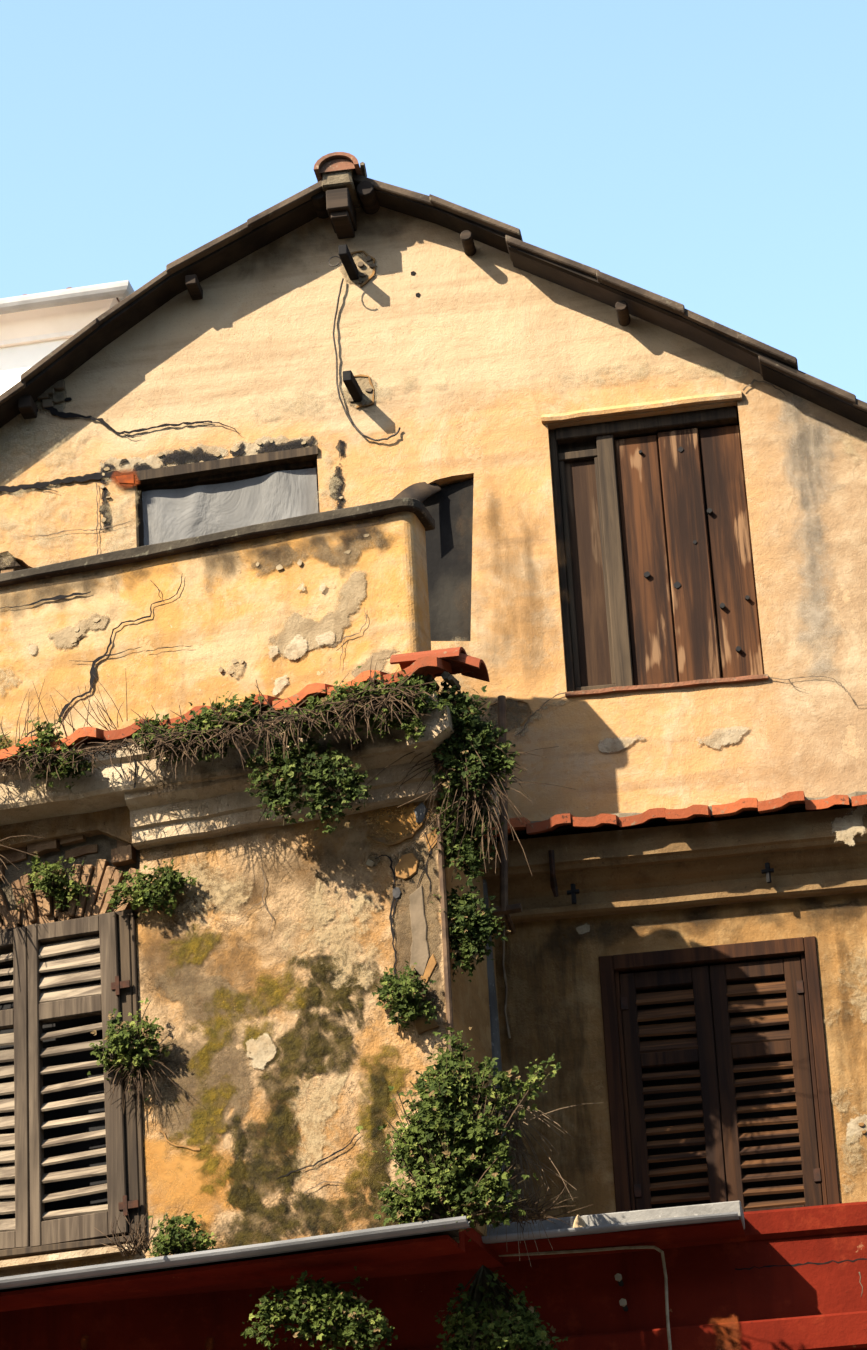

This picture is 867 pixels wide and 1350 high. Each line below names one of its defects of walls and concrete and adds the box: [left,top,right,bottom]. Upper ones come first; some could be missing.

crack [0,471,130,555]
crack [41,400,240,438]
peeling [98,434,317,545]
peeling [322,440,345,510]
crack [0,591,91,609]
spalling [251,531,386,660]
crack [17,576,190,742]
spalling [153,960,277,1151]
water stain [305,961,352,1073]
water stain [226,1114,249,1208]
water stain [273,1087,297,1222]
water stain [369,1063,389,1190]